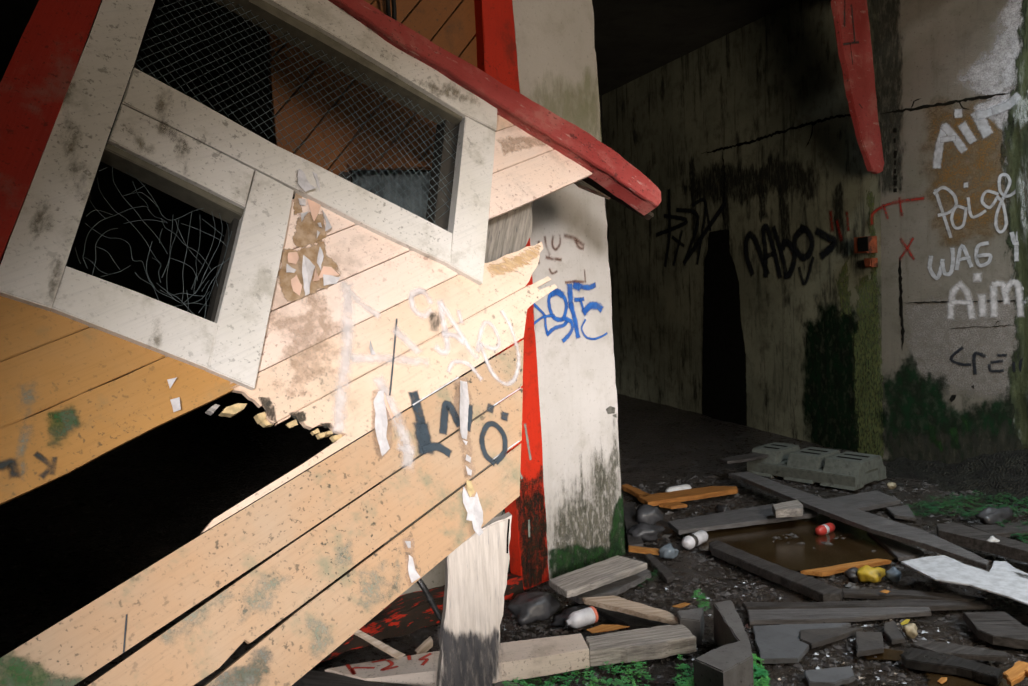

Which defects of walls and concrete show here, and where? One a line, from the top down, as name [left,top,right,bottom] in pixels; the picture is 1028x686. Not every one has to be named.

damp [961,0,1028,131]
crack [881,93,1009,192]
damp [852,253,1022,464]
crack [898,258,1028,347]